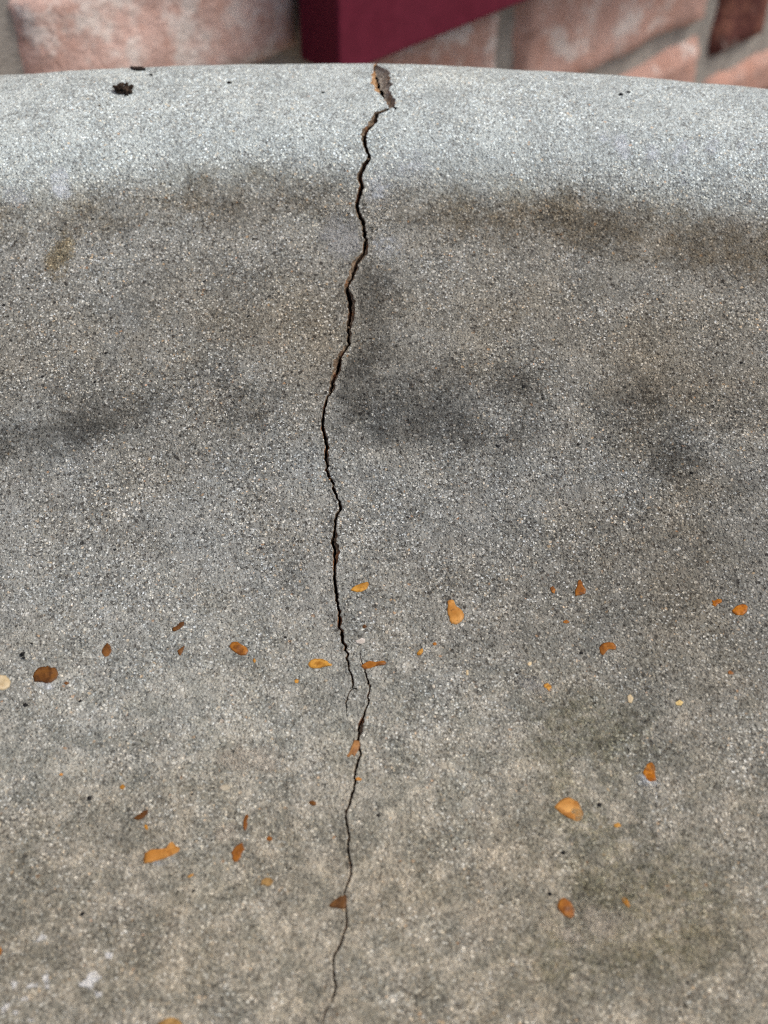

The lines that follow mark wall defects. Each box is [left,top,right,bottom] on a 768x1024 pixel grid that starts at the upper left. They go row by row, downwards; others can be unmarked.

crack [316,105,394,1024]